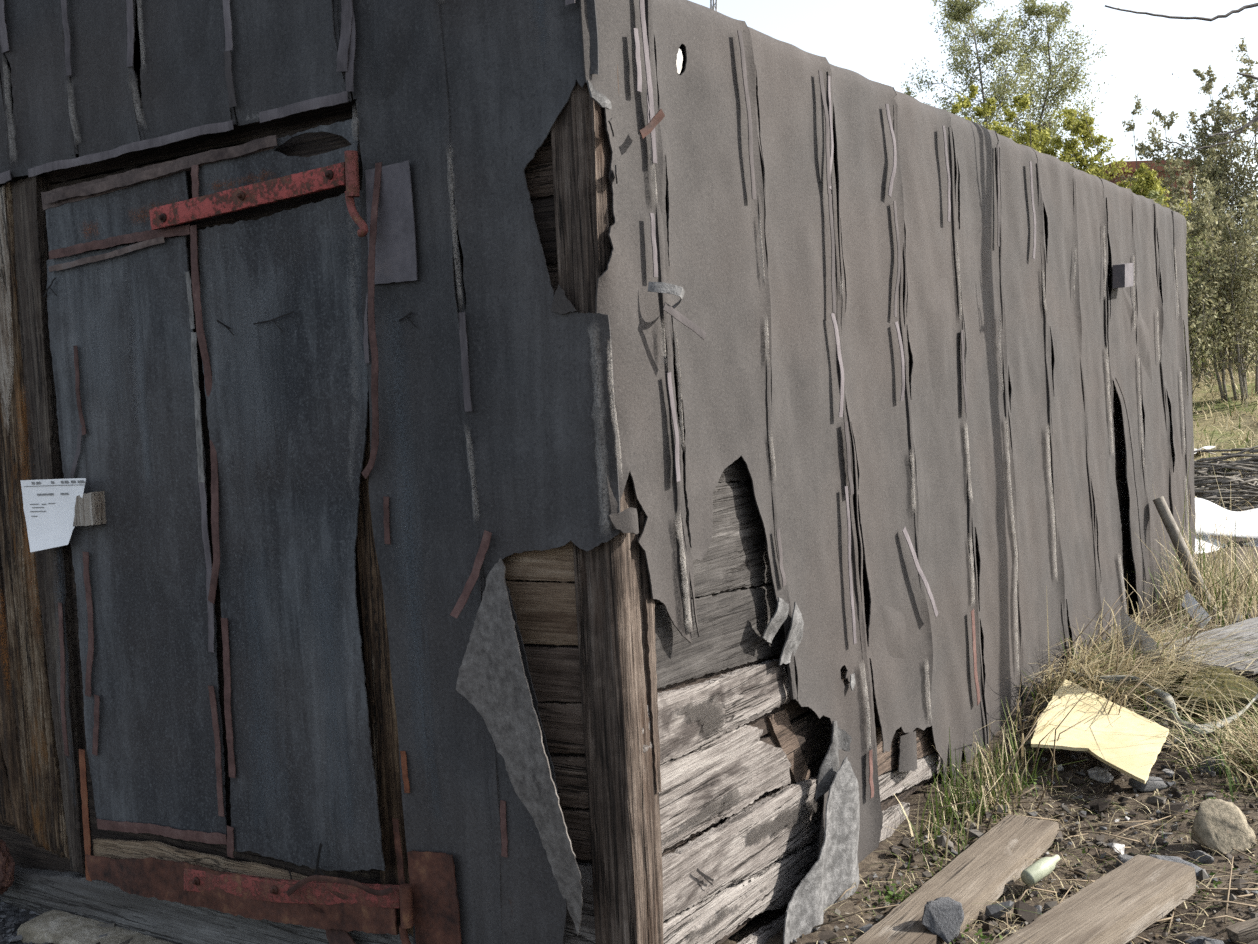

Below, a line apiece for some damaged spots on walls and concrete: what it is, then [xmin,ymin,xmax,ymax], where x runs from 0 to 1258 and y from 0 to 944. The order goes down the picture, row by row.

peeling [586,80,612,110]
peeling [608,507,639,534]
peeling [762,597,804,665]
peeling [456,558,583,935]
peeling [783,721,860,944]